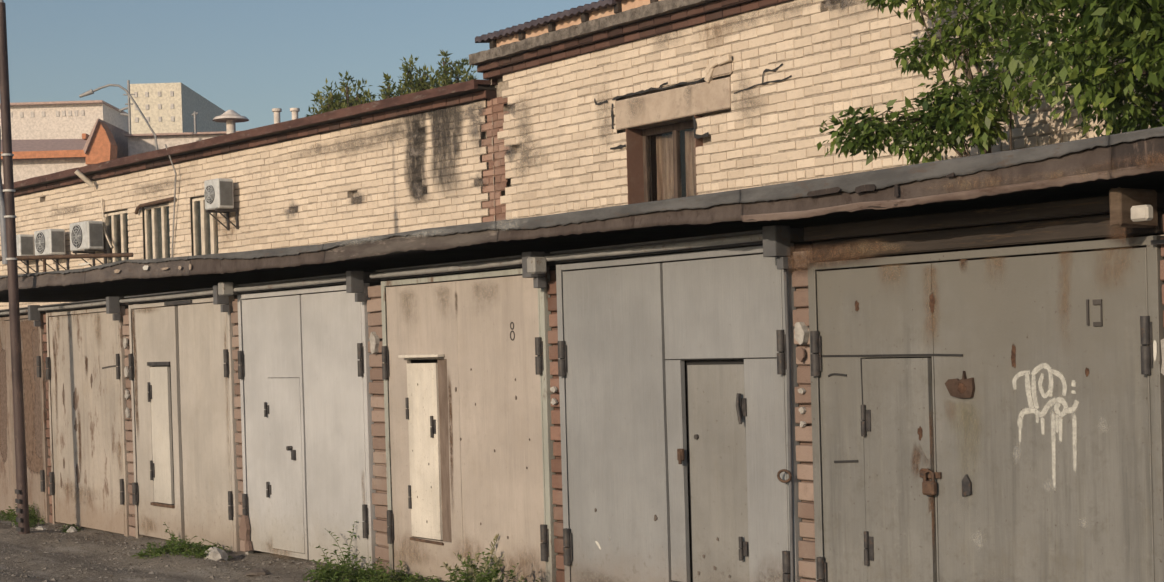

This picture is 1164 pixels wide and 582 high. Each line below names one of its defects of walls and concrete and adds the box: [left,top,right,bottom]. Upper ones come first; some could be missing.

crack [734,63,792,94]
water stain [406,102,482,199]
peeling [20,319,81,488]
spalling [85,357,130,418]
corrosion [913,422,932,481]